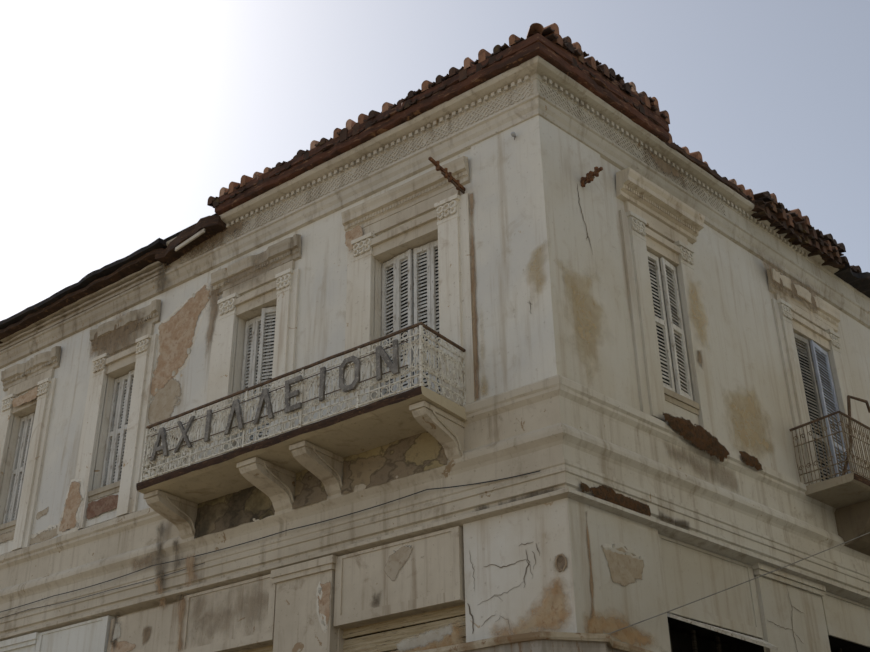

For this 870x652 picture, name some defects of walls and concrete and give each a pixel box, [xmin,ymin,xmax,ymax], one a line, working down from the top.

flaking render [148,282,211,426]
flaking render [30,478,119,545]
crack [467,542,540,634]
flaking render [601,542,644,586]